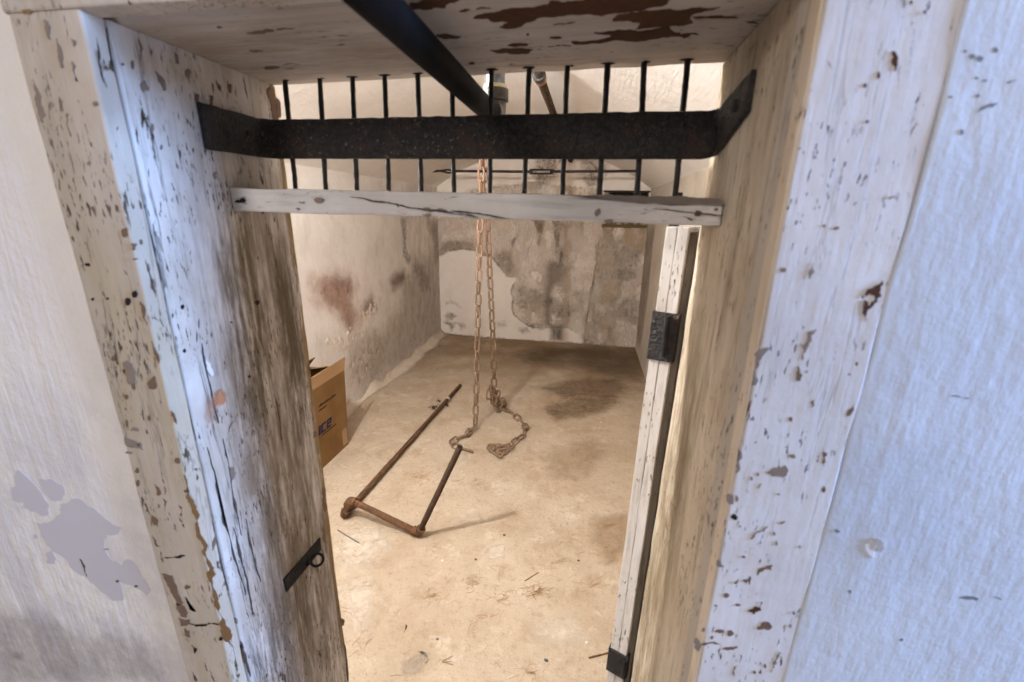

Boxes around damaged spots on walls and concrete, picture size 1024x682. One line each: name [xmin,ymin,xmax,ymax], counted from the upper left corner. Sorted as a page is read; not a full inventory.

peeling [409,0,758,55]
crack [356,197,535,261]
peeling [862,280,883,321]
peeling [751,348,769,386]
peeling [796,330,816,381]
damp [547,379,625,419]
peeling [736,447,796,488]
peeling [726,493,741,528]
peeling [11,470,150,601]
peeling [715,579,773,630]
peeling [694,628,738,652]